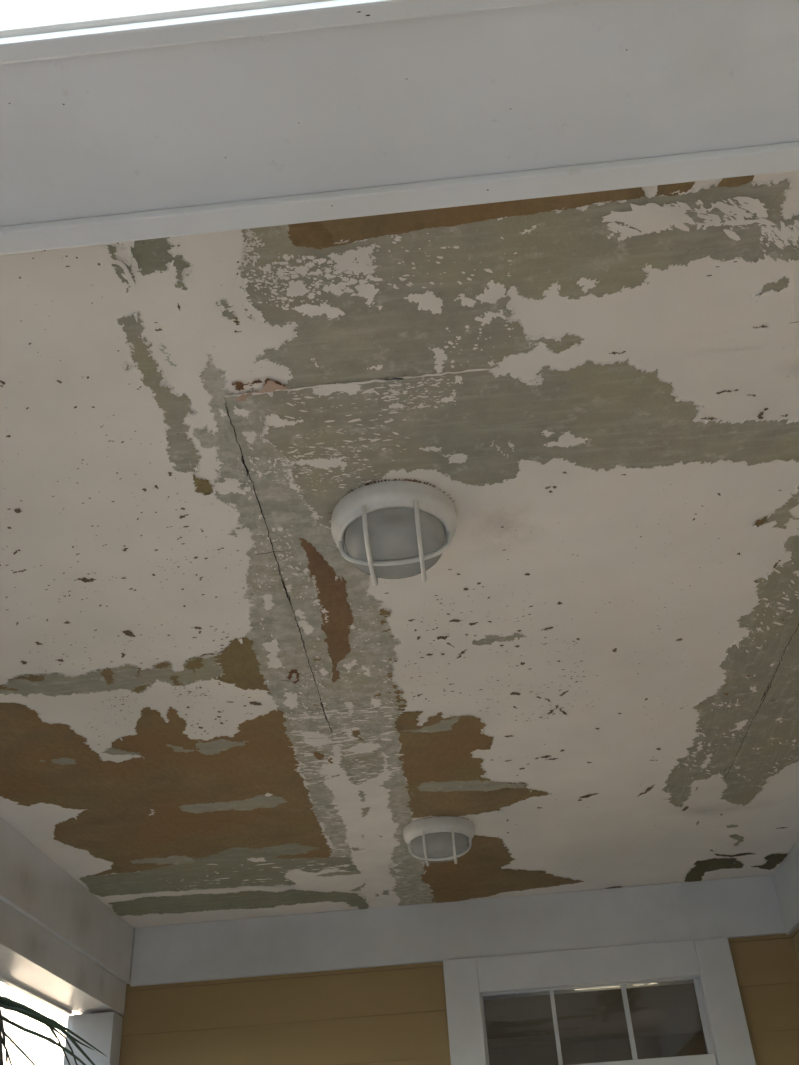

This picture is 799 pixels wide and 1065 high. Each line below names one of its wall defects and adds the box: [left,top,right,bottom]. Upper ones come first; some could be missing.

peeling [97,237,194,293]
crack [224,397,378,737]
peeling [116,177,799,909]
crack [724,622,799,780]